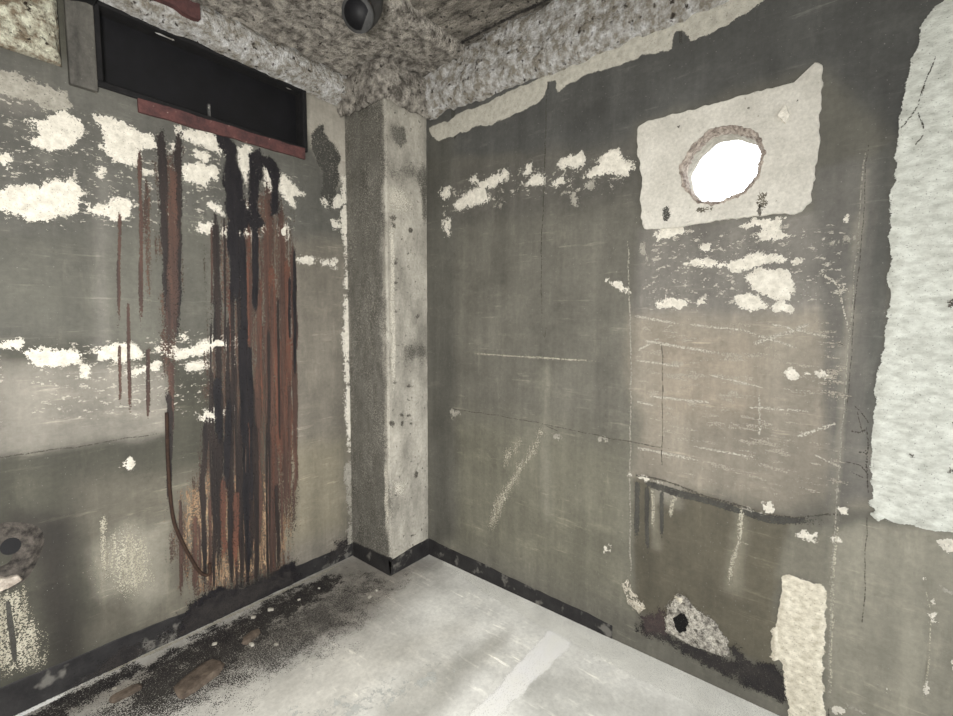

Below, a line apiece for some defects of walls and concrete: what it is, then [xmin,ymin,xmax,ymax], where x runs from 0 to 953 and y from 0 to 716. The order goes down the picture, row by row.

peeling [429,0,763,141]
peeling [0,70,306,242]
peeling [438,147,636,238]
peeling [605,278,631,294]
peeling [640,214,856,315]
flaking render [868,0,953,554]
peeling [0,329,238,423]
rust [116,127,301,604]
peeling [122,456,136,470]
leakage [0,583,49,677]
leakage [91,561,344,682]
flaking render [769,574,866,716]